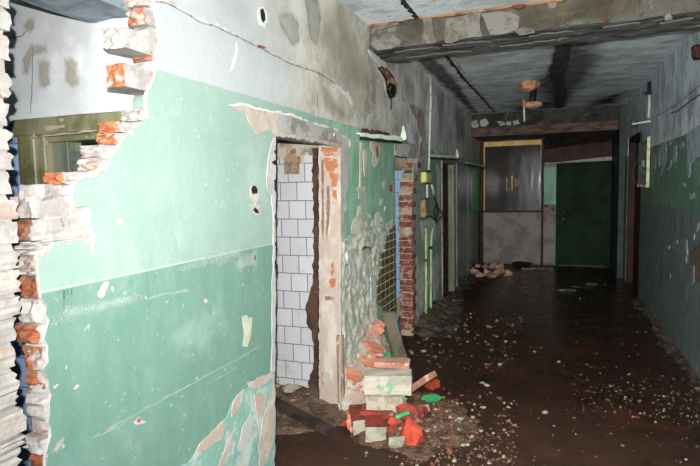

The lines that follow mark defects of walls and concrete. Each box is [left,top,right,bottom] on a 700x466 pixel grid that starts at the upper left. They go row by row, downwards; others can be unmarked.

spalling [0,0,12,61]
spalling [102,0,158,96]
crack [155,0,353,120]
leakage [517,42,598,110]
leakage [592,93,623,105]
peeling [655,125,700,200]
spalling [0,72,147,466]
peeling [181,102,351,466]
spalling [325,100,441,387]